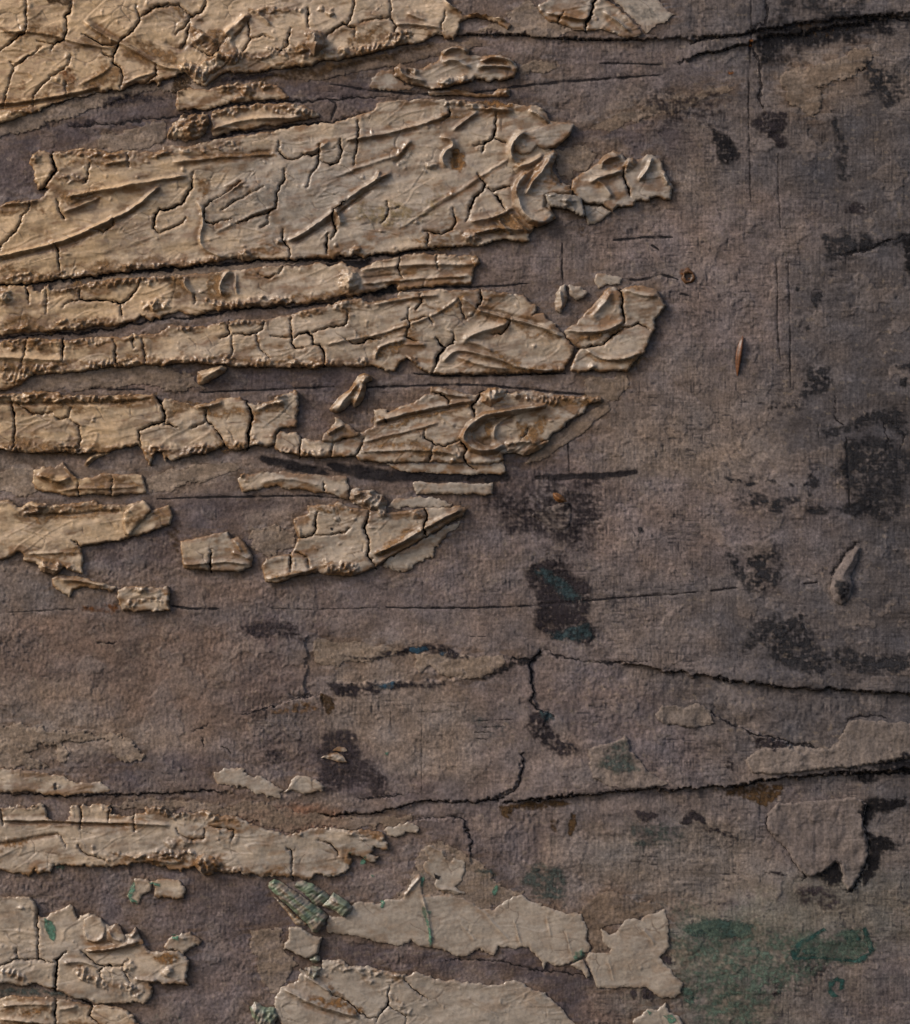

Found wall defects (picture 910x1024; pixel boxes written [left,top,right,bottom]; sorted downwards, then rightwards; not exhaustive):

crack [584,0,597,34]
crack [677,0,910,108]
peeling [0,0,674,612]
leakage [725,407,910,520]
leakage [525,556,595,645]
crack [510,650,910,723]
leakage [745,608,910,674]
peeling [0,722,419,903]
crack [323,752,681,852]
peeling [766,797,868,891]
peeling [0,895,202,1024]
peeling [274,845,683,1024]